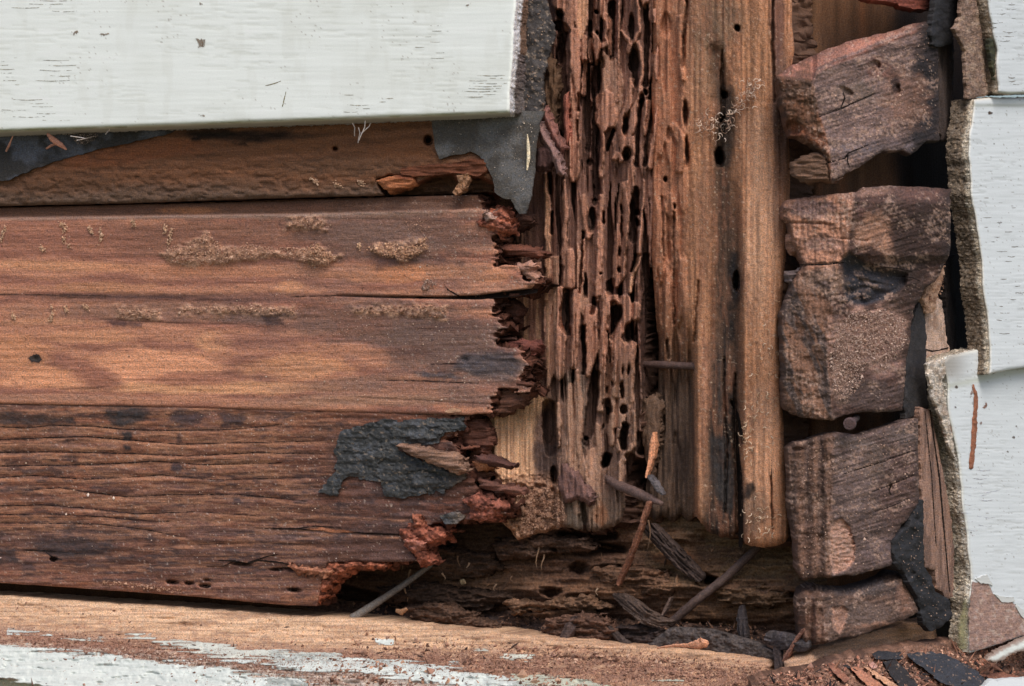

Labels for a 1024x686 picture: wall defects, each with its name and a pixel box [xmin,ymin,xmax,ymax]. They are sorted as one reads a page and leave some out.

spalling [0,189,774,670]
rust [969,384,987,469]
crack [207,554,288,567]
peeling [968,574,1024,651]
peeling [0,628,612,686]